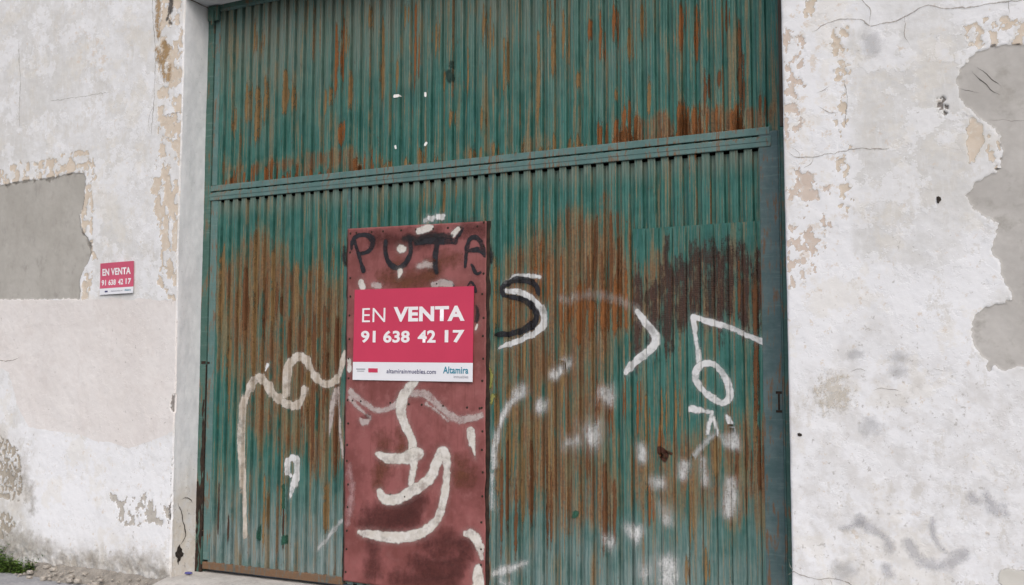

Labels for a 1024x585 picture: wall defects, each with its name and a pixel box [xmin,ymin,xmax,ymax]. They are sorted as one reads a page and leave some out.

flaking render [0,150,98,300]
peeling [150,0,183,301]
corrosion [324,18,353,148]
corrosion [539,82,651,151]
corrosion [661,1,745,138]
peeling [783,26,854,289]
crack [818,0,1020,40]
flaking render [956,15,1024,372]
corrosion [218,216,342,533]
corrosion [492,214,764,560]
spalling [0,437,23,502]
peeling [109,492,171,528]